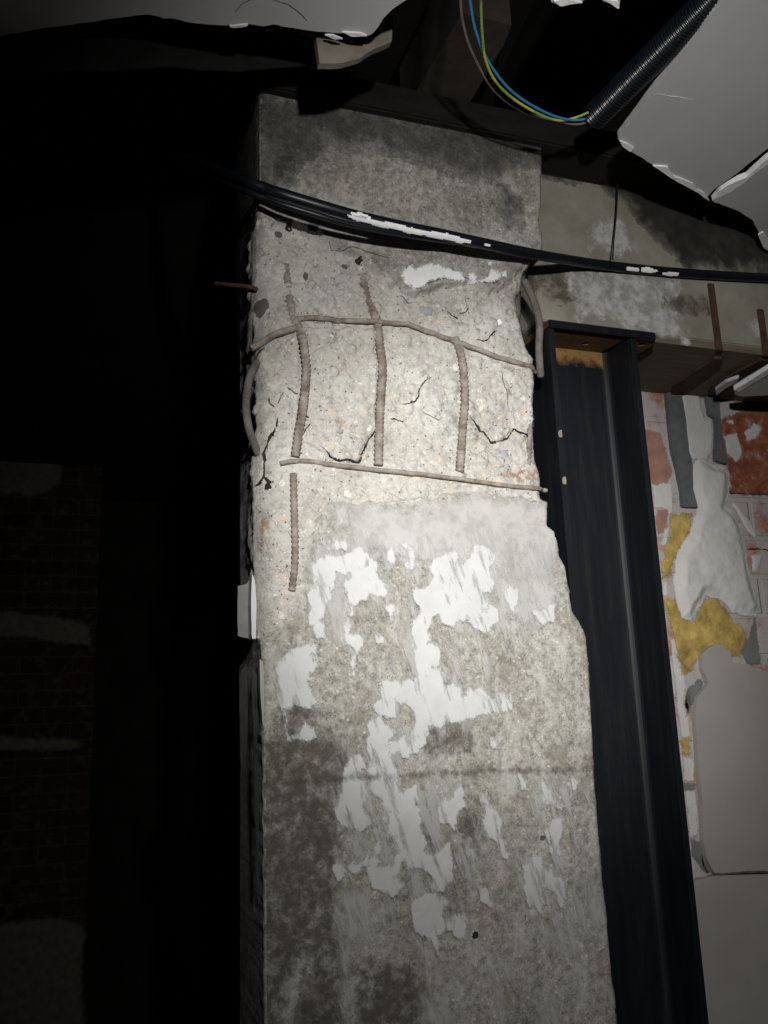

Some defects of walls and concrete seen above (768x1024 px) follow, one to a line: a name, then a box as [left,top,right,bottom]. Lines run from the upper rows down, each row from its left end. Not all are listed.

spalling [653,153,768,201]
peeling [758,231,768,250]
crack [243,348,311,489]
crack [324,379,441,463]
crack [471,373,535,443]
flaking render [645,429,672,545]
flaking render [721,408,768,538]
spalling [239,218,606,1020]
peeling [671,639,690,738]
peeling [683,757,698,838]